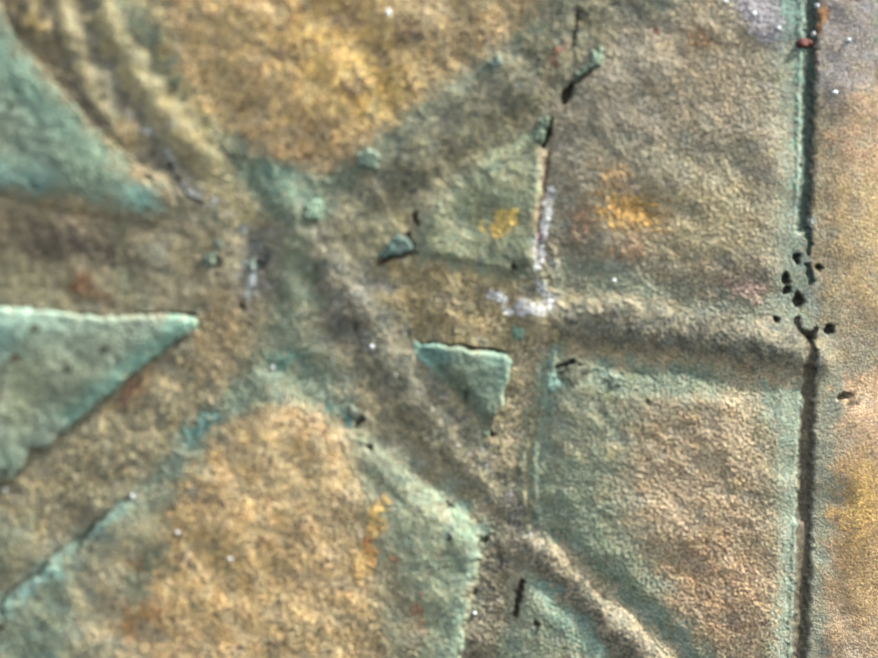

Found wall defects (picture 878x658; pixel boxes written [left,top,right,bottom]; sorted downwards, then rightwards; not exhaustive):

crack [773,0,833,658]